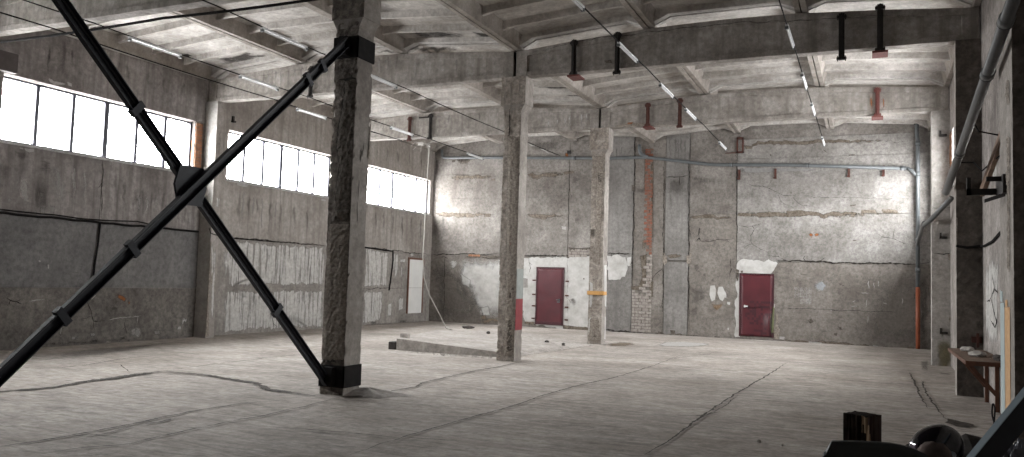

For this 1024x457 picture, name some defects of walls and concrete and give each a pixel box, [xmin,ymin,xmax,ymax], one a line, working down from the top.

peeling [449,109,777,356]
crack [608,142,950,325]
crack [0,329,711,455]
crack [644,363,786,455]
crack [818,365,970,426]